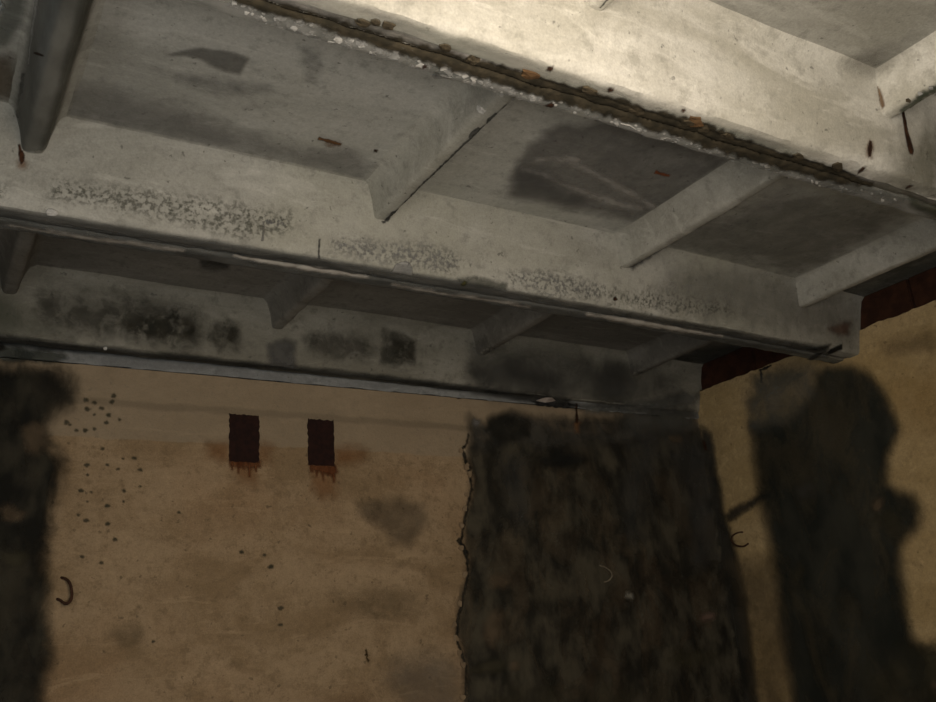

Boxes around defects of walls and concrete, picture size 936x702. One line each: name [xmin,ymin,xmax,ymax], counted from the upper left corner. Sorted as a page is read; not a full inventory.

water stain [176,49,247,73]
spalling [229,0,898,204]
corrosion [902,112,914,154]
water stain [513,125,726,218]
water stain [41,298,199,343]